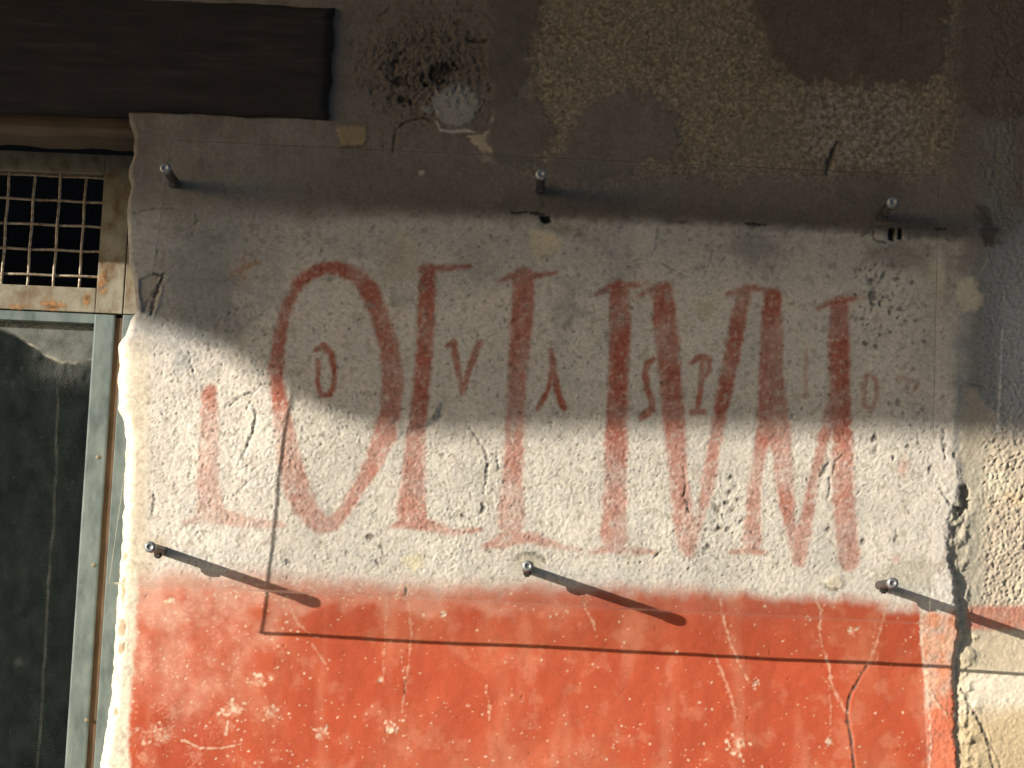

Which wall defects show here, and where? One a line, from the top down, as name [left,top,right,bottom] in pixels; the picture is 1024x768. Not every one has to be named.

flaking render [378,35,495,167]
crack [466,422,502,516]
crack [940,428,948,462]
crack [938,483,973,587]
crack [813,592,891,768]
crack [918,600,1003,768]